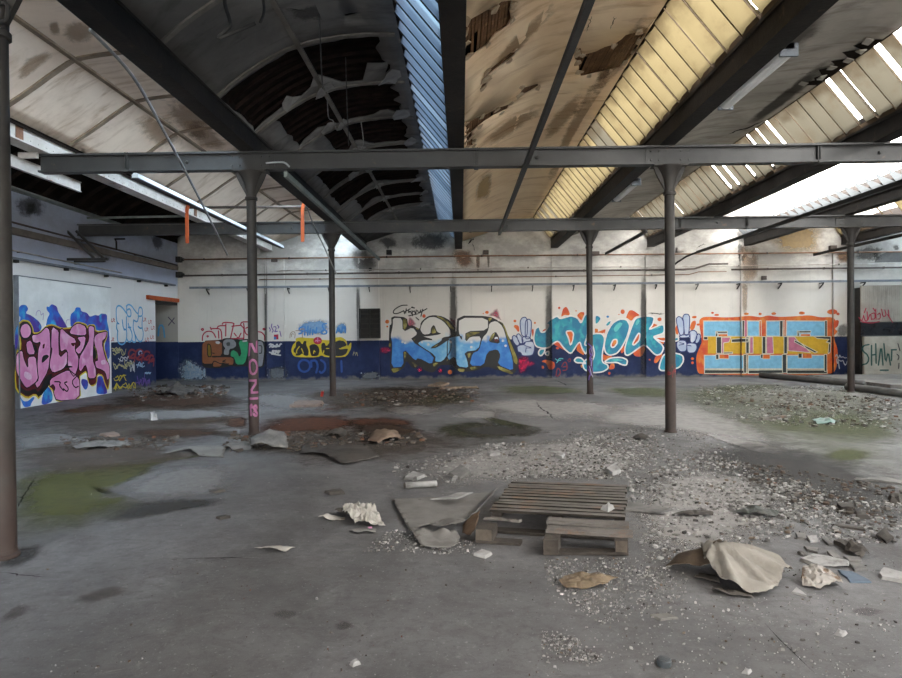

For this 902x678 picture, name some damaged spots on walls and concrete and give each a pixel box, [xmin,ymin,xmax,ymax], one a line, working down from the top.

spalling [465,0,518,61]
spalling [574,28,644,78]